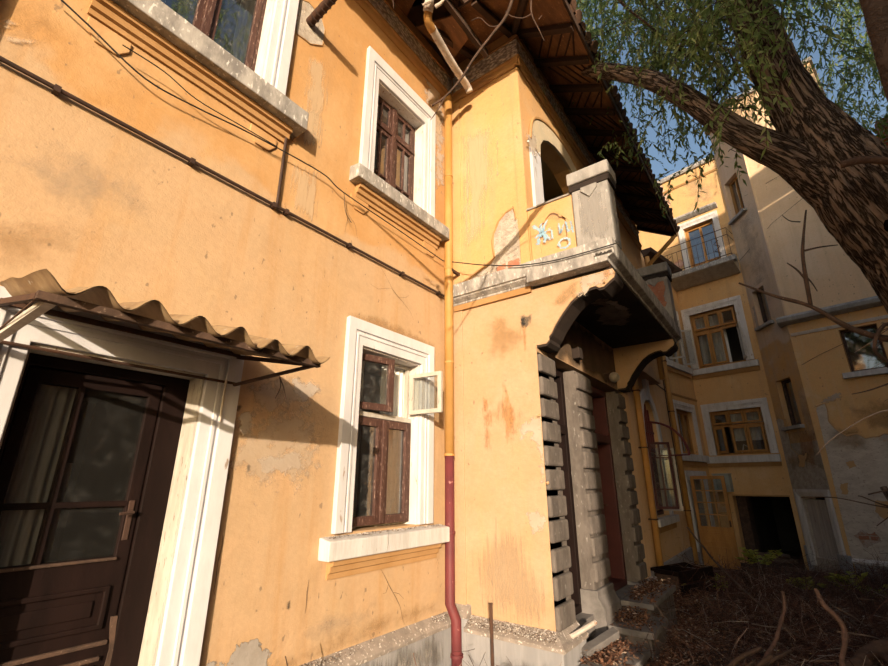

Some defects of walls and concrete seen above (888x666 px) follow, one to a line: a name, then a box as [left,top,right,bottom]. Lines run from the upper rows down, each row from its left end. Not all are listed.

flaking render [466,206,521,281]
peeling [228,378,320,489]
flaking render [776,393,888,561]
flaking render [206,638,272,666]